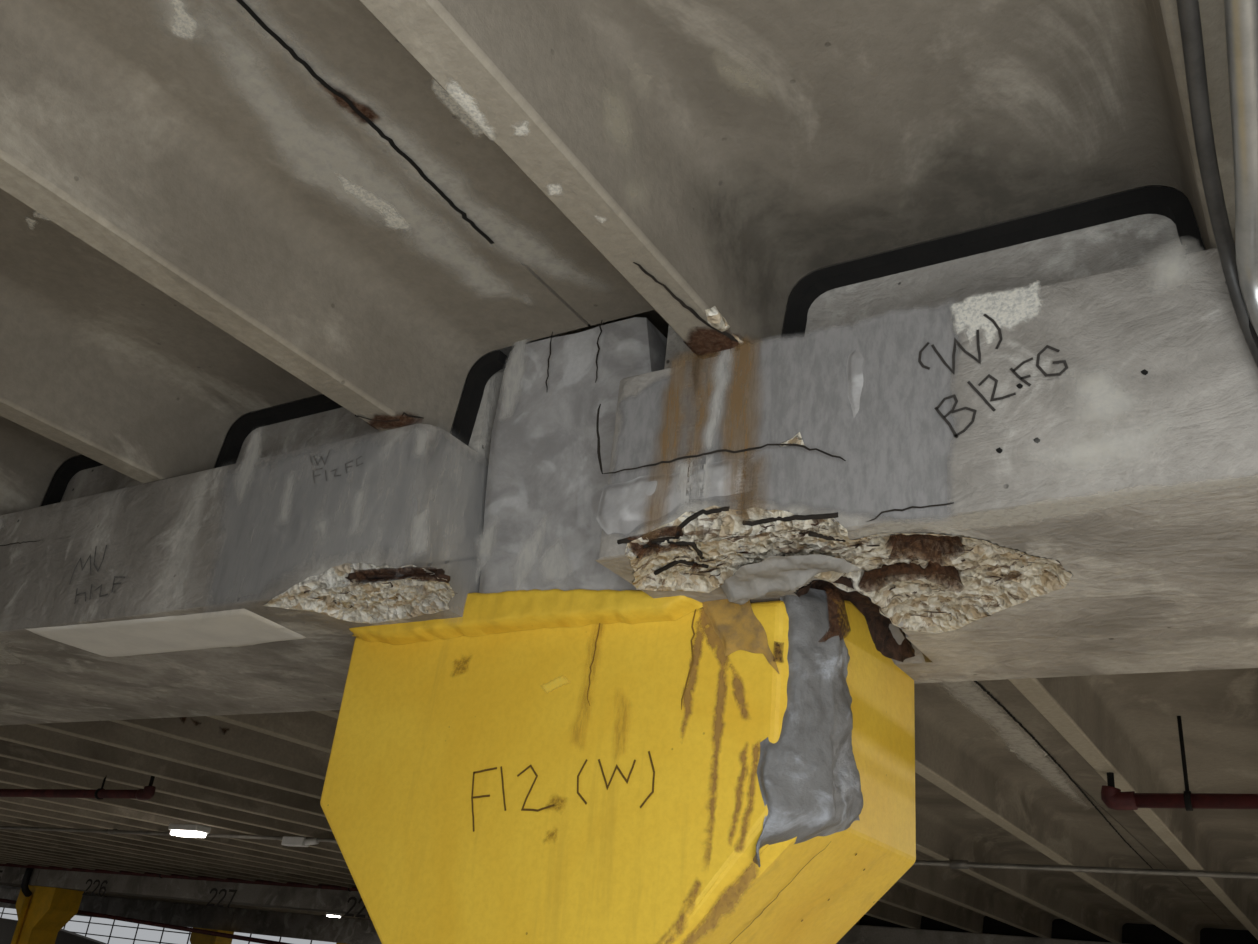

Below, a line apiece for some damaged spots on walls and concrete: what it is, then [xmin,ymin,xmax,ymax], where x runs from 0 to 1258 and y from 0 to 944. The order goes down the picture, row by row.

water stain [165,0,509,295]
crack [236,0,494,244]
water stain [313,67,584,281]
rust [648,340,758,534]
spalling [262,562,458,624]
rust [773,641,784,663]
rust [819,588,851,642]
spalling [617,505,1072,860]
crack [943,681,1153,869]
peeling [666,862,757,944]